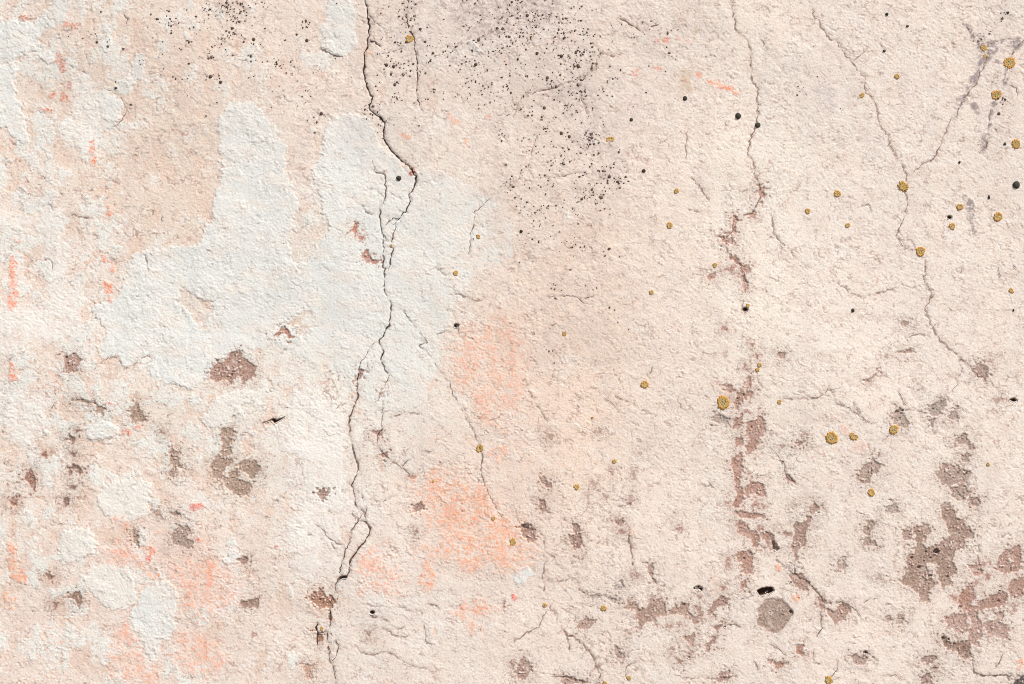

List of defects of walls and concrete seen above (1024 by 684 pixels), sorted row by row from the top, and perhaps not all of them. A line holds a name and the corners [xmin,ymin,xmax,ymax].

peeling [0,112,501,664]
leakage [38,0,737,378]
crack [308,0,636,683]
spalling [503,649,540,684]
spalling [699,178,772,302]
crack [715,5,806,316]
spalling [512,313,1024,684]
crack [757,1,1024,457]